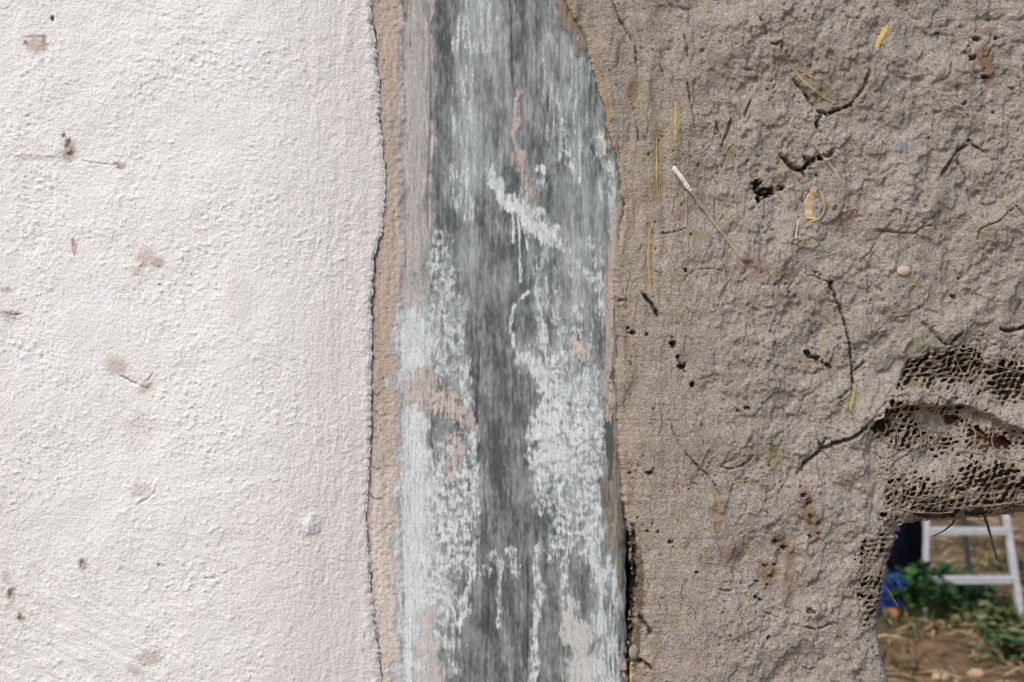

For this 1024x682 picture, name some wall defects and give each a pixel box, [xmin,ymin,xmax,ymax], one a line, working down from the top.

peeling [556,0,587,60]
peeling [509,88,539,203]
peeling [598,134,610,157]
crack [780,78,868,176]
peeling [569,194,623,422]
crack [816,277,854,399]
peeling [405,367,476,487]
crack [800,426,868,471]
crack [626,527,652,681]